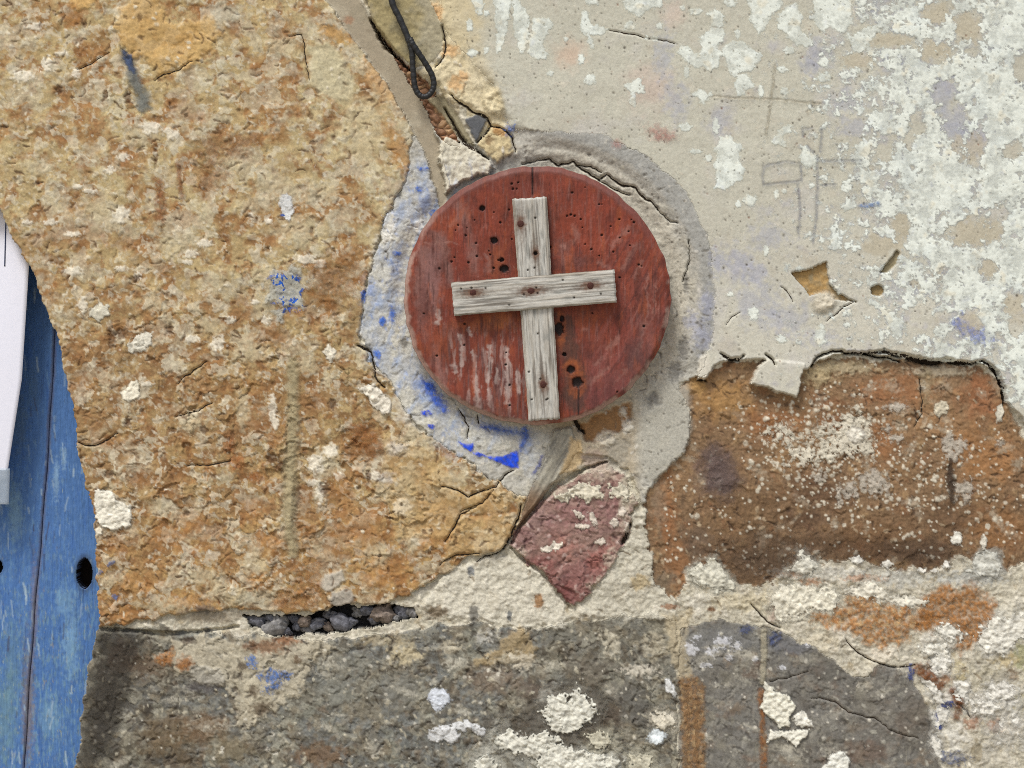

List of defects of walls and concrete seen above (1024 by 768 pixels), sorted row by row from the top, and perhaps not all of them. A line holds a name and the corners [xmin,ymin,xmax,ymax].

peeling [578,0,607,85]
peeling [623,0,663,41]
peeling [624,78,645,107]
crack [445,94,690,279]
peeling [677,0,1024,408]
crack [440,470,521,565]